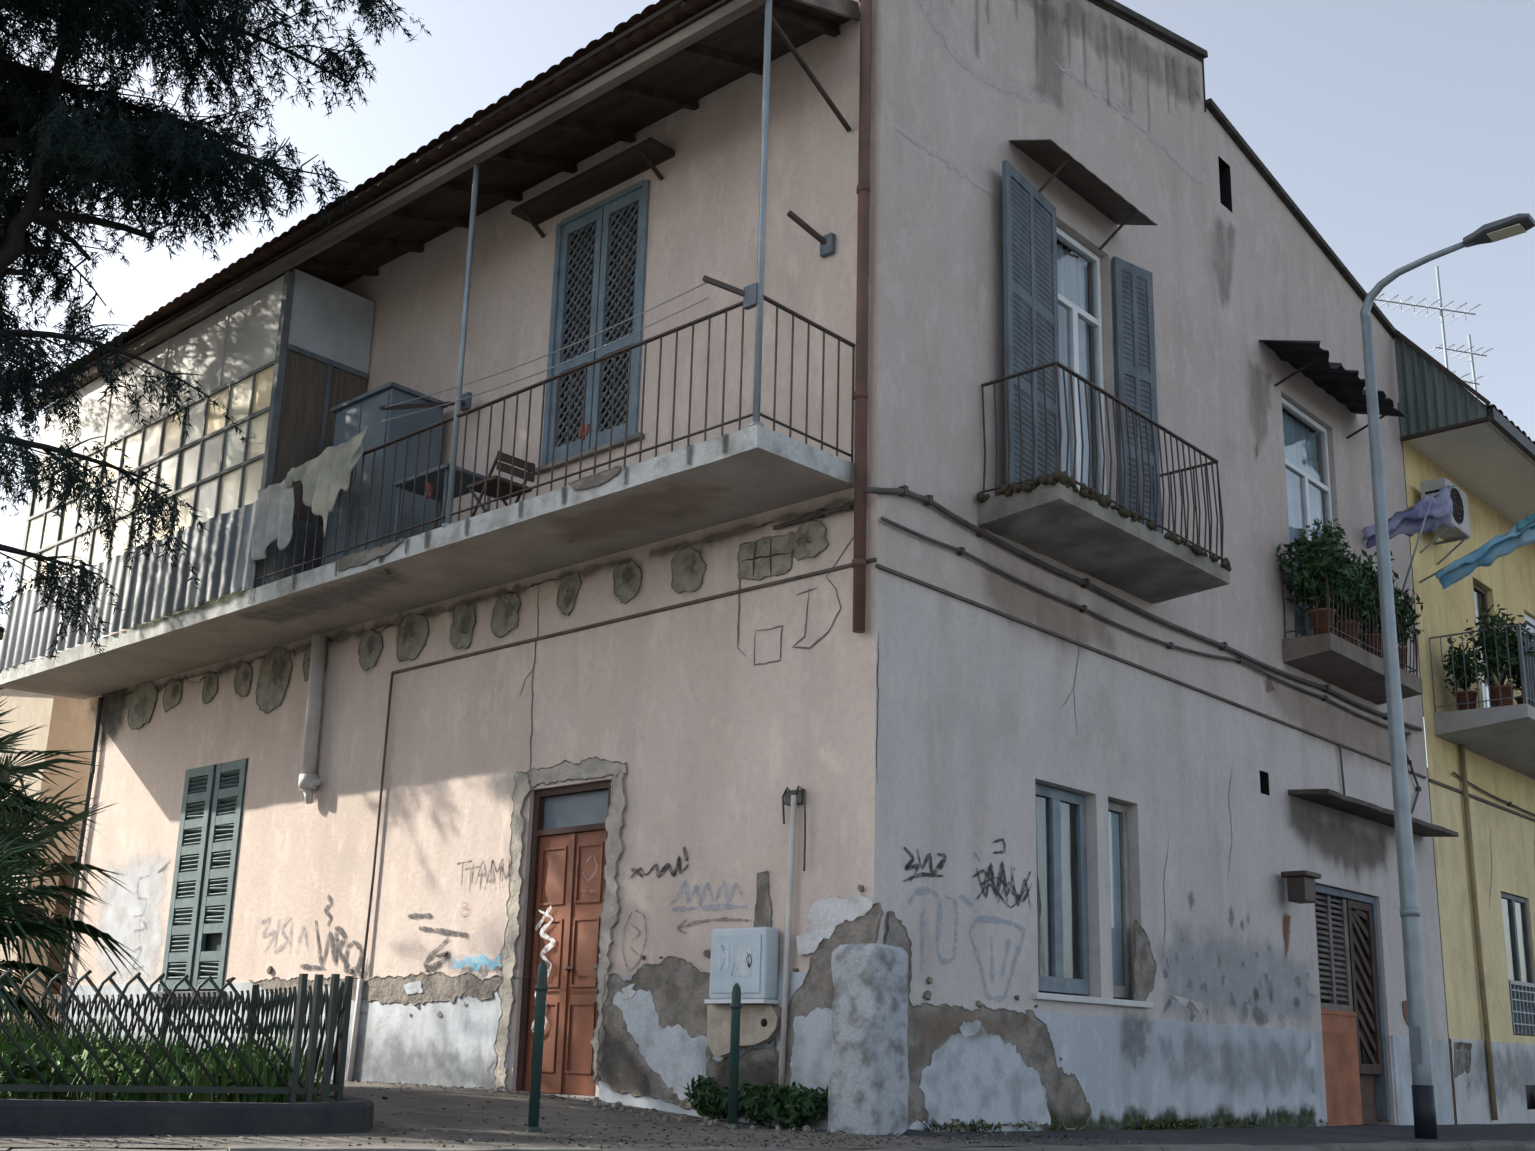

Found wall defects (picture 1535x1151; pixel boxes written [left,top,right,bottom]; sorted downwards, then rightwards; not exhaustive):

spalling [337,538,403,571]
spalling [358,613,429,670]
spalling [450,593,521,649]
spalling [557,571,582,616]
spalling [613,559,642,604]
spalling [671,547,707,594]
spalling [737,519,829,581]
spalling [248,756,1092,1130]